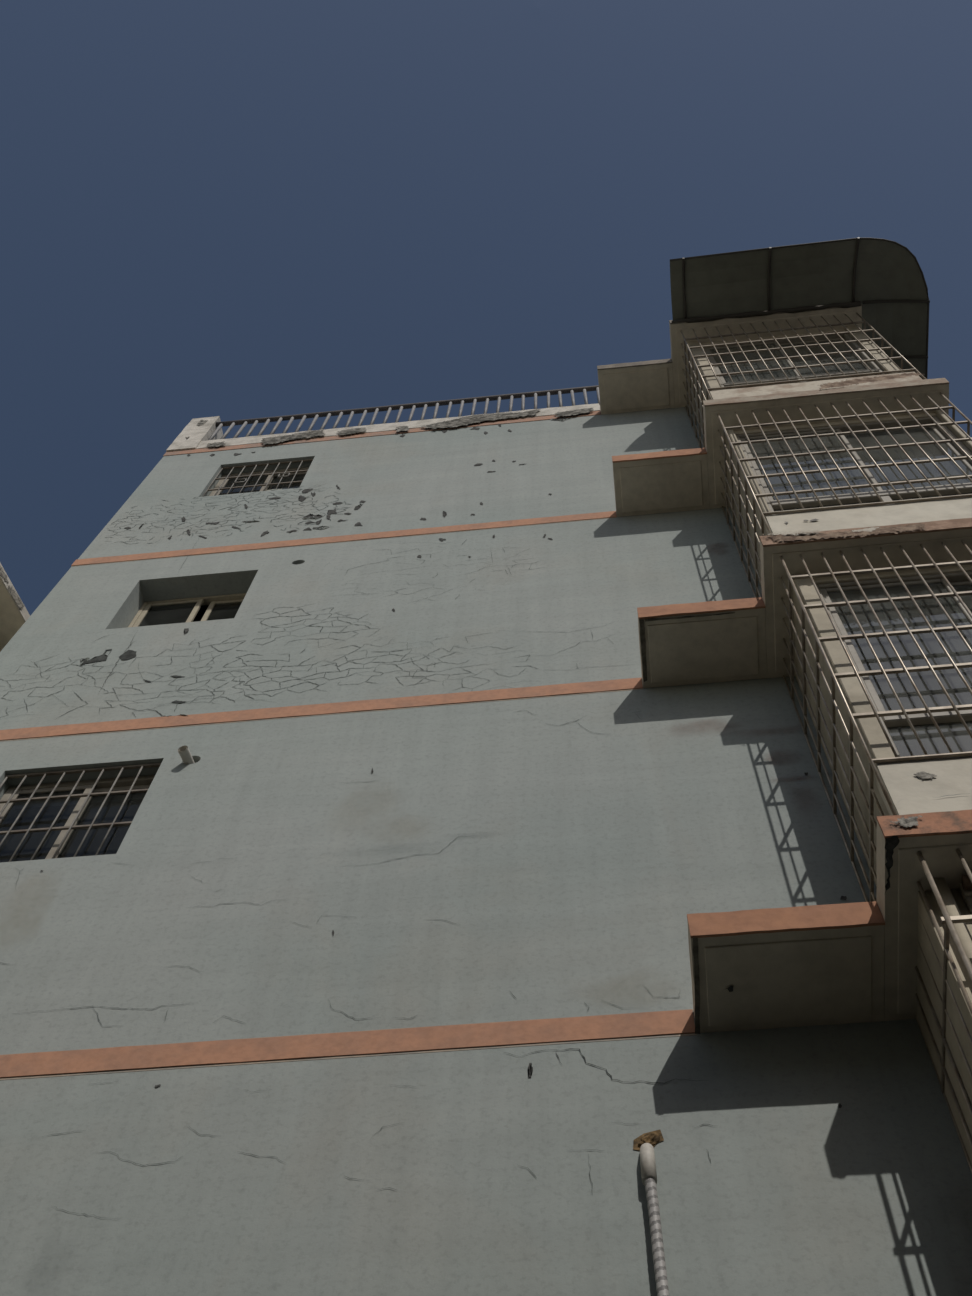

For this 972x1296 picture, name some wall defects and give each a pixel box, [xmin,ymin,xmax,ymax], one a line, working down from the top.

peeling [168,504,269,539]
peeling [287,485,365,533]
crack [2,541,632,734]
peeling [80,649,137,666]
crack [504,1048,707,1084]